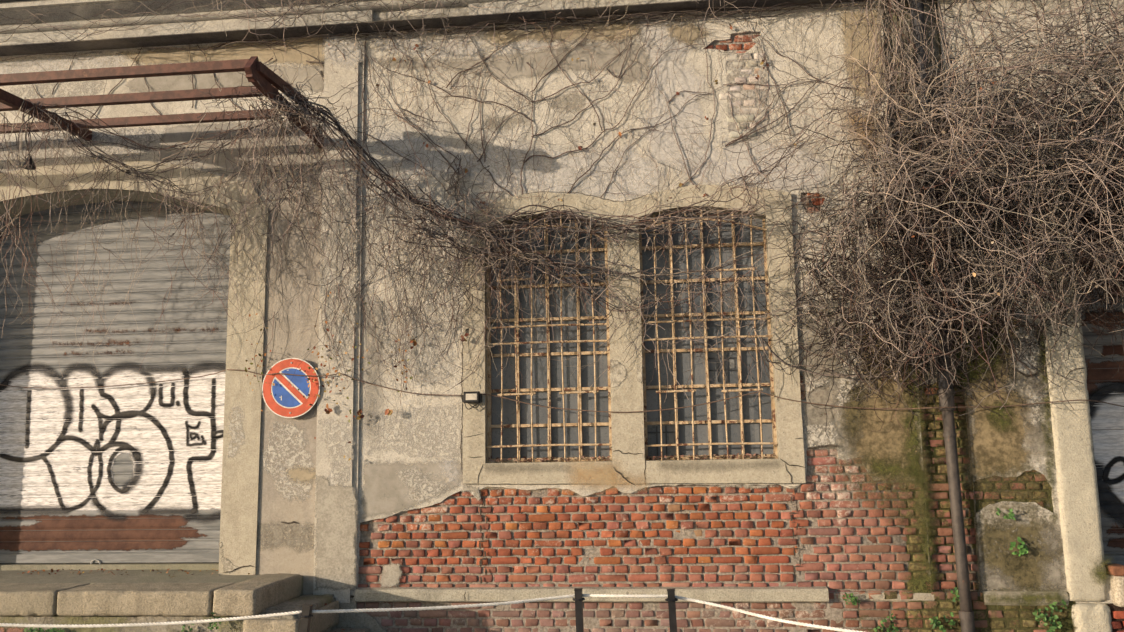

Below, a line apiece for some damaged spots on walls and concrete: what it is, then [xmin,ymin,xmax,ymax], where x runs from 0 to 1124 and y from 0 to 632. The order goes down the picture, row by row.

peeling [0,120,323,199]
peeling [0,35,360,119]
peeling [371,22,826,213]
peeling [378,302,456,386]
leakage [964,298,1052,484]
flaking render [257,342,935,592]
rust [0,514,207,552]